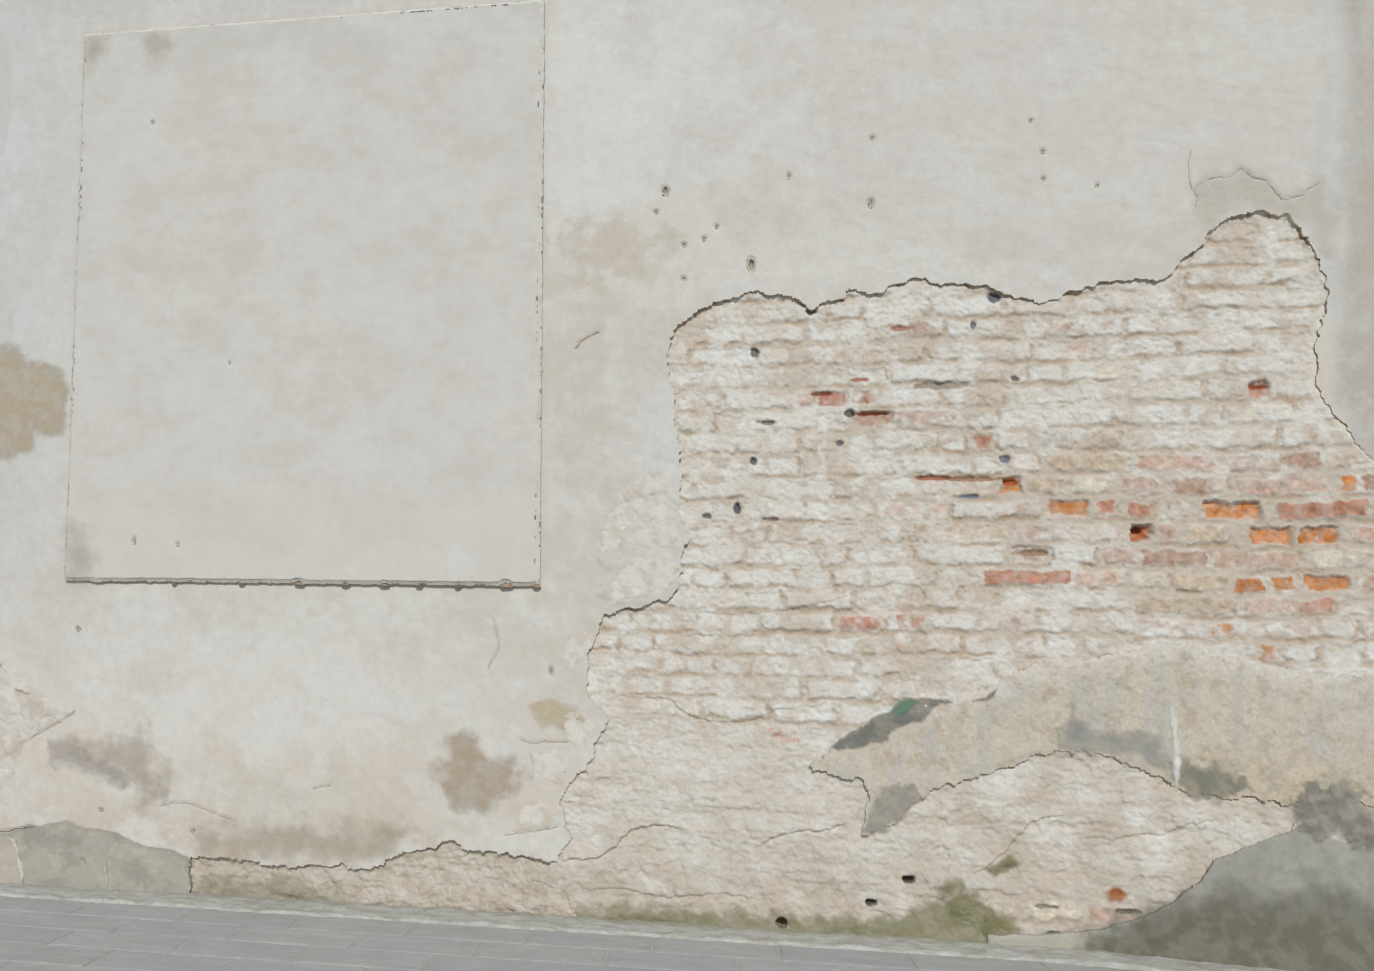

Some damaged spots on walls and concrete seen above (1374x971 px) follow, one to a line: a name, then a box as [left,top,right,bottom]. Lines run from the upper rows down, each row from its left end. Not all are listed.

crack [1188,150,1321,212]
damp [0,349,66,456]
flaking render [189,209,1374,935]
damp [444,734,511,811]
damp [1088,896,1374,971]